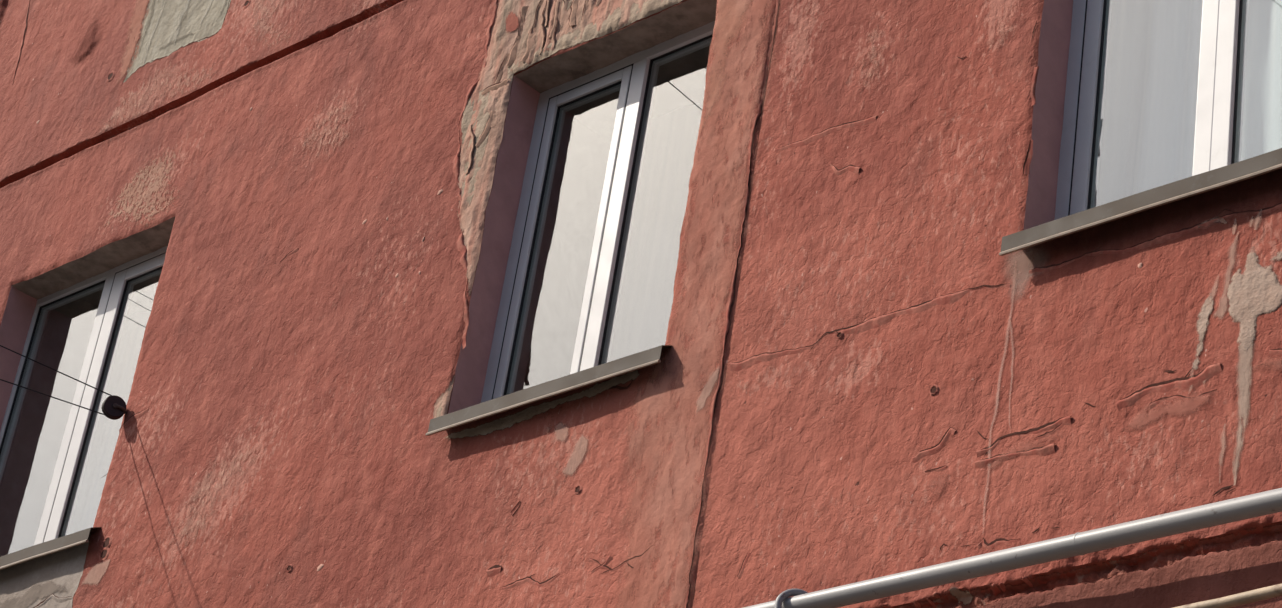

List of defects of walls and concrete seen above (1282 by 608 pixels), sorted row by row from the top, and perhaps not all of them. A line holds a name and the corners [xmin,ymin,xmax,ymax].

crack [12,0,30,112]
spalling [102,0,231,131]
peeling [437,0,772,608]
crack [684,0,1282,608]
peeling [433,375,455,419]
leakage [984,267,1016,509]
spalling [0,531,110,608]